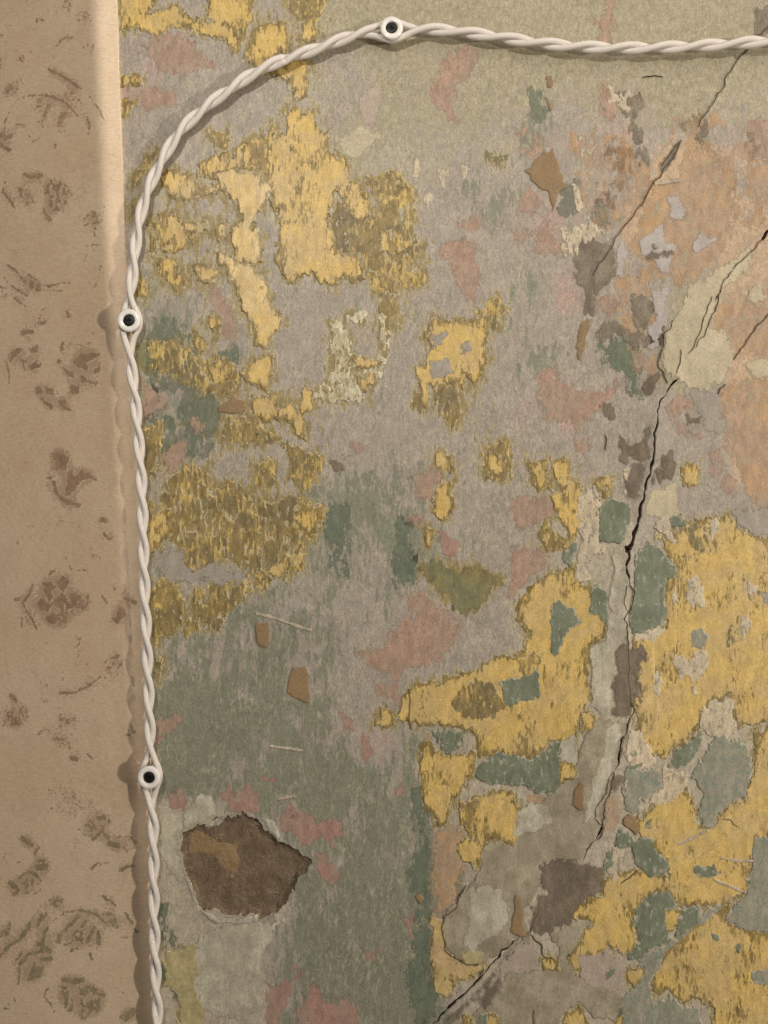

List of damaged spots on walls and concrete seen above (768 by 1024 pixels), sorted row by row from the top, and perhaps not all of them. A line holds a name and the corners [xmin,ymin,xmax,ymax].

peeling [515,126,583,213]
flaking render [607,84,708,173]
crack [593,27,768,275]
peeling [118,0,433,683]
flaking render [573,234,655,360]
peeling [714,285,768,359]
peeling [390,451,456,588]
crack [586,230,768,851]
peeling [374,566,607,1024]
peeling [506,514,768,1024]
flaking render [180,811,341,925]
crack [435,885,556,1022]